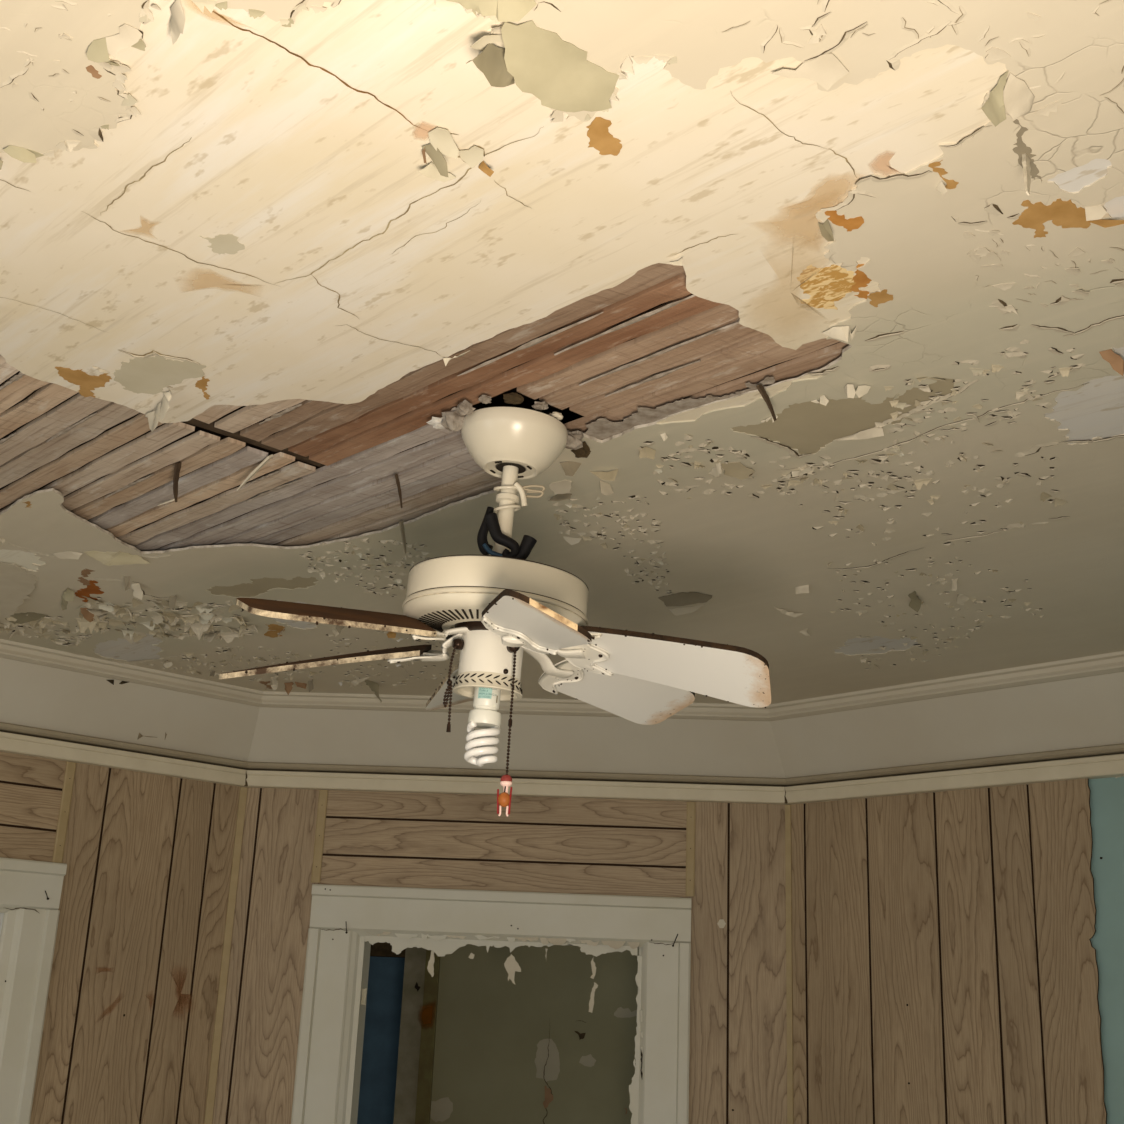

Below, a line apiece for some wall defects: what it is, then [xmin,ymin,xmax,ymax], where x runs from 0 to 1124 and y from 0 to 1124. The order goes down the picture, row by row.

crack [0,67,39,102]
crack [72,67,133,142]
crack [84,0,540,357]
crack [532,0,565,12]
flaking render [0,0,1124,433]
crack [760,0,868,62]
crack [731,93,992,211]
crack [886,0,960,70]
flaking render [548,461,712,616]
peeling [584,339,1124,669]
flaking render [0,538,460,702]
peeling [364,932,643,1124]